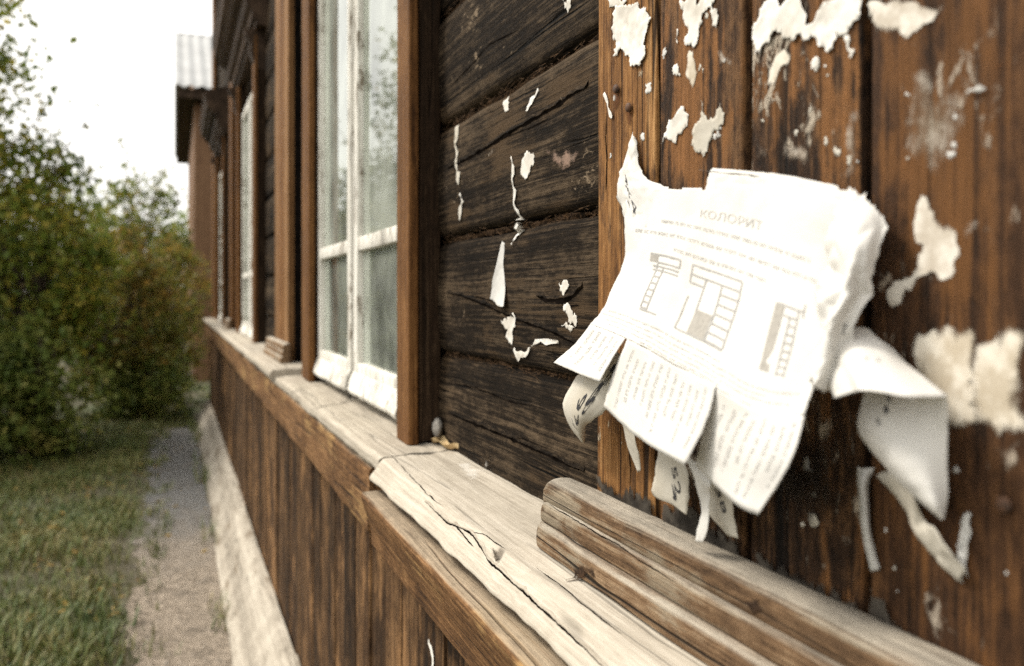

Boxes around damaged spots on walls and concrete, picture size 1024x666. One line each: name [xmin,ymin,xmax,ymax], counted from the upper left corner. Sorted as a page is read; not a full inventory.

crack [447,83,588,168]
crack [388,453,620,666]